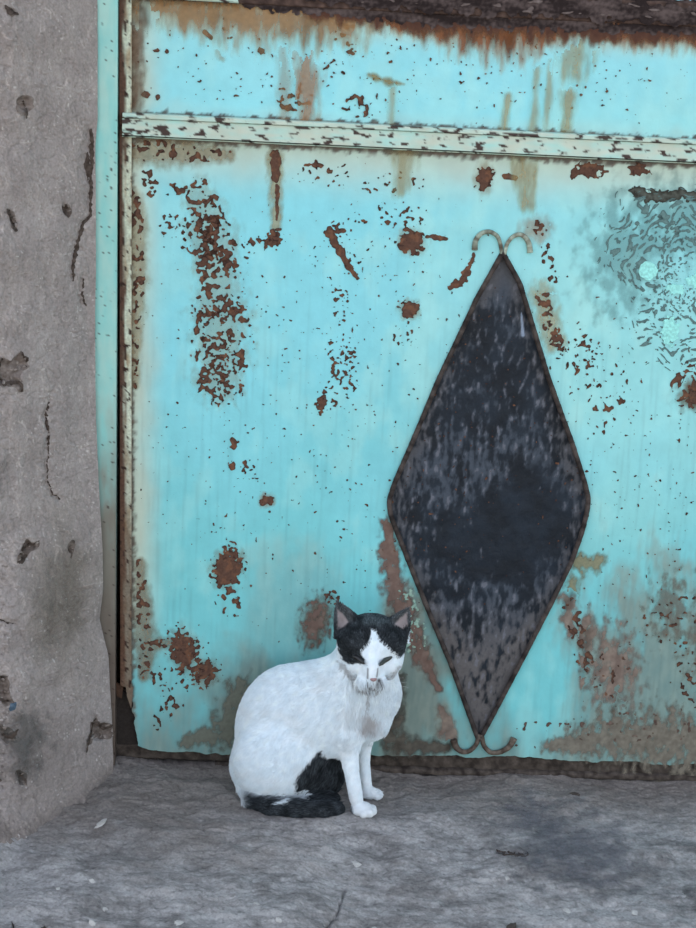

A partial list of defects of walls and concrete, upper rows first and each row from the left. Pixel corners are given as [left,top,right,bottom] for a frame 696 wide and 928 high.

corrosion [132,0,696,130]
corrosion [474,159,536,209]
corrosion [132,139,349,513]
corrosion [527,161,696,446]
corrosion [136,559,223,731]
corrosion [199,512,252,617]
corrosion [371,501,443,692]